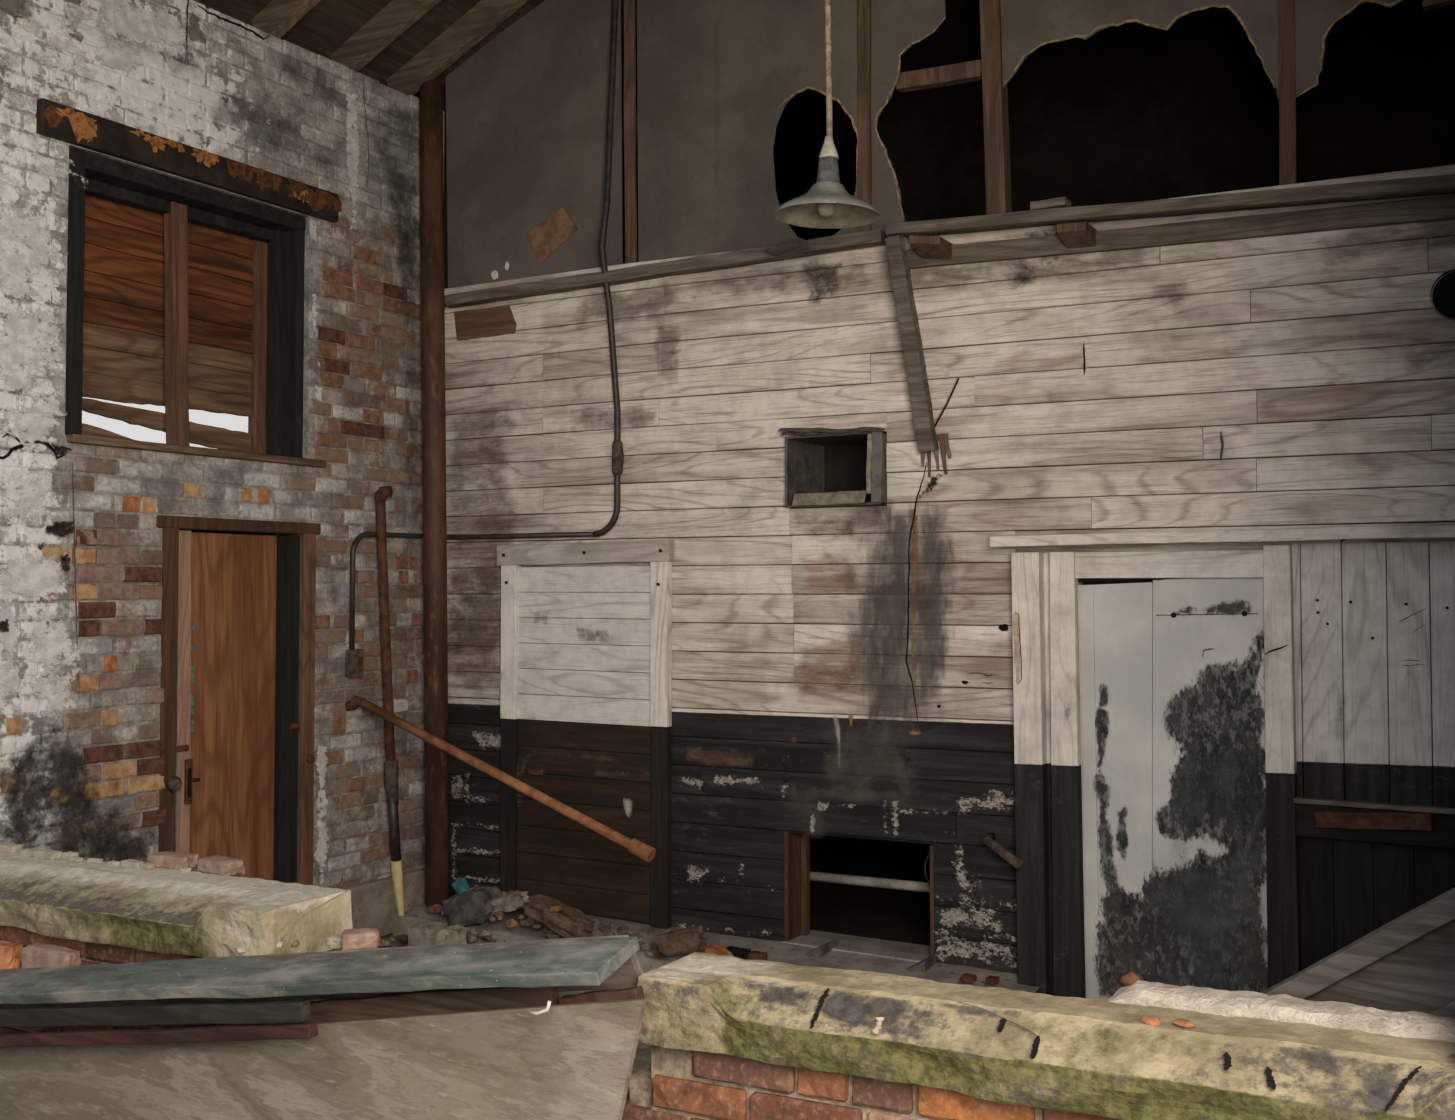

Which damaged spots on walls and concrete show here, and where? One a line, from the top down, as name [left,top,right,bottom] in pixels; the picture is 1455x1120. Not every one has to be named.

spalling [1004,4,1275,89]
spalling [1296,0,1403,98]
corrosion [44,104,97,143]
corrosion [130,129,342,213]
damp [857,523,939,710]
peeling [810,801,856,833]
peeling [883,789,1015,836]
peeling [1094,631,1268,998]
peeling [934,835,1018,968]